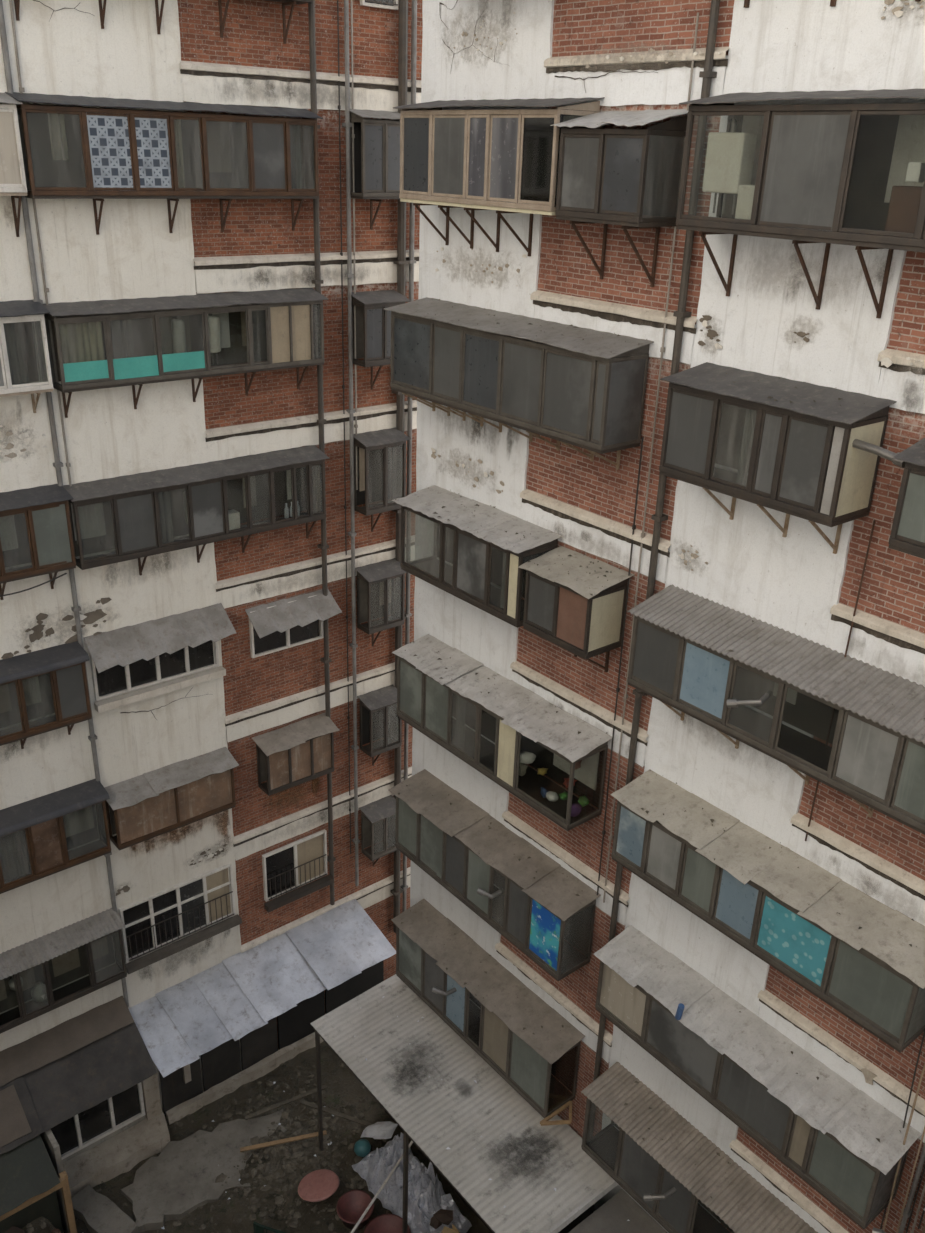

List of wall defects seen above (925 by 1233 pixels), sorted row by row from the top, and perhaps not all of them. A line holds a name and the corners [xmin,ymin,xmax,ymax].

peeling [881,0,923,20]
peeling [1,597,112,659]